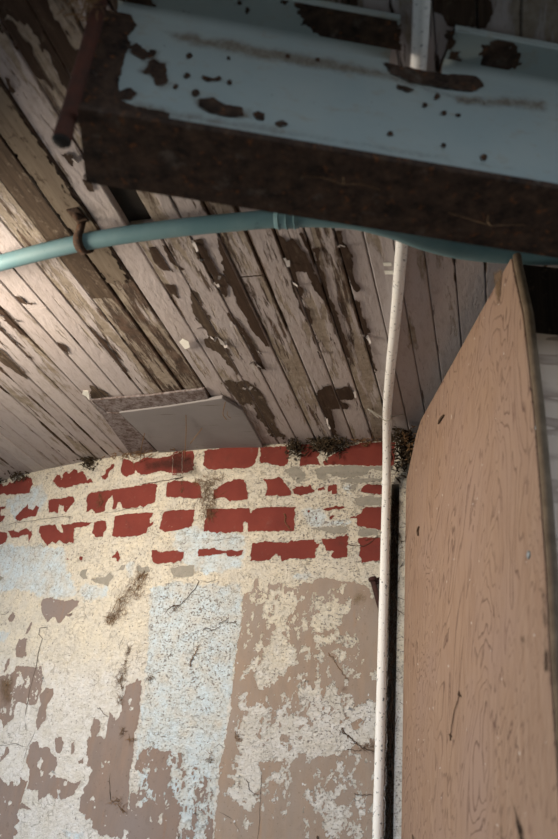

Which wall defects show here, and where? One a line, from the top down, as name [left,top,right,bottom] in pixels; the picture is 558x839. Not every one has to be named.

peeling [0,77,98,241]
rust [81,10,178,118]
rust [202,75,232,85]
rust [192,89,265,121]
peeling [433,0,493,28]
peeling [60,247,127,300]
peeling [148,245,184,272]
peeling [191,236,270,372]
peeling [277,232,351,359]
peeling [0,290,396,578]
peeling [79,550,126,587]
peeling [0,577,389,839]